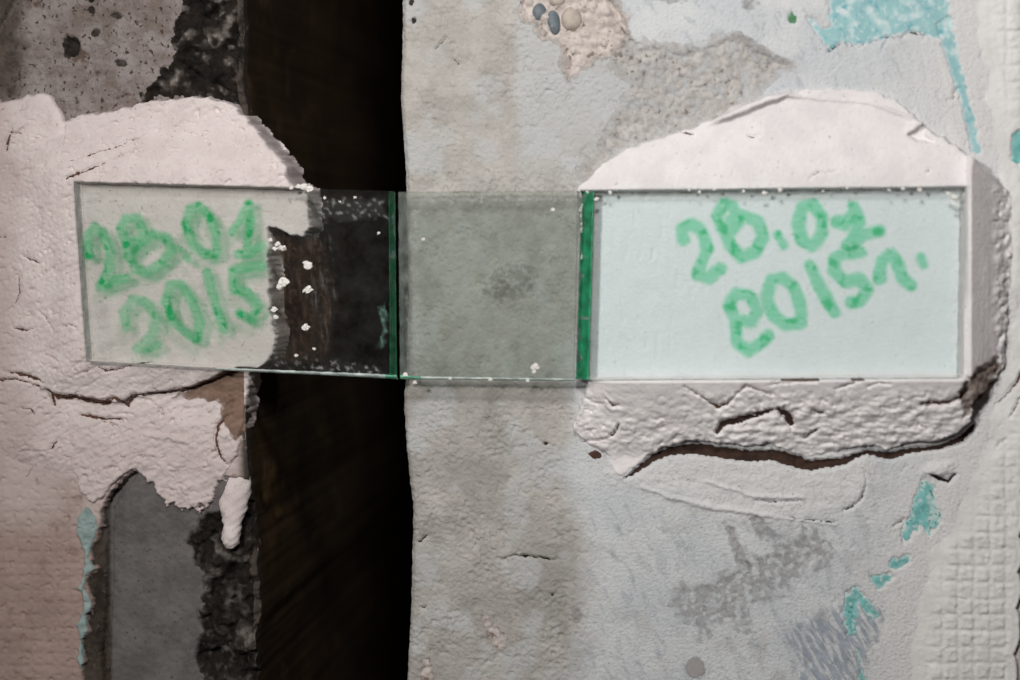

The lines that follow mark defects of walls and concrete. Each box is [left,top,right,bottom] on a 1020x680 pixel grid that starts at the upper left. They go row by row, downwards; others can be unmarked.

spalling [0,0,244,122]
spalling [513,0,792,181]
peeling [809,0,981,154]
crack [0,362,215,426]
crack [691,377,886,438]
crack [921,397,959,405]
spalling [76,470,261,680]
peeling [870,474,942,589]
crack [931,473,956,483]
peeling [841,586,880,680]